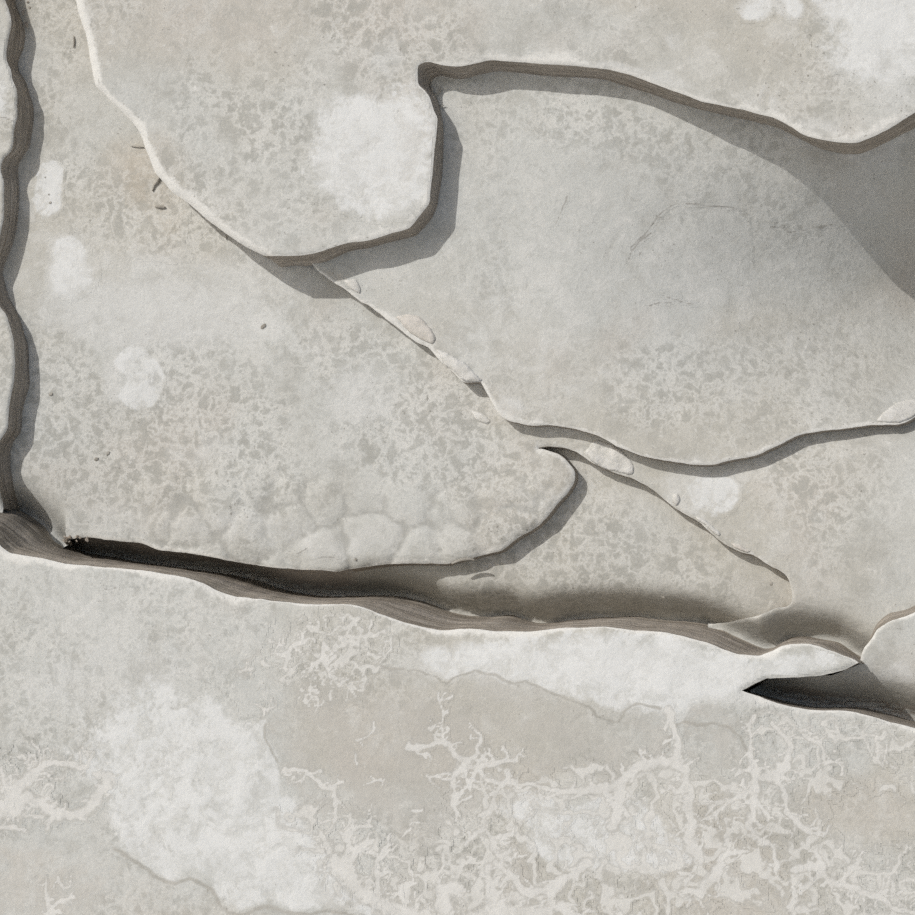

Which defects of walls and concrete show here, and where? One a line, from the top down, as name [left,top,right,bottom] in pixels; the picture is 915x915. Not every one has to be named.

spalling [0,0,915,721]
crack [0,0,915,728]